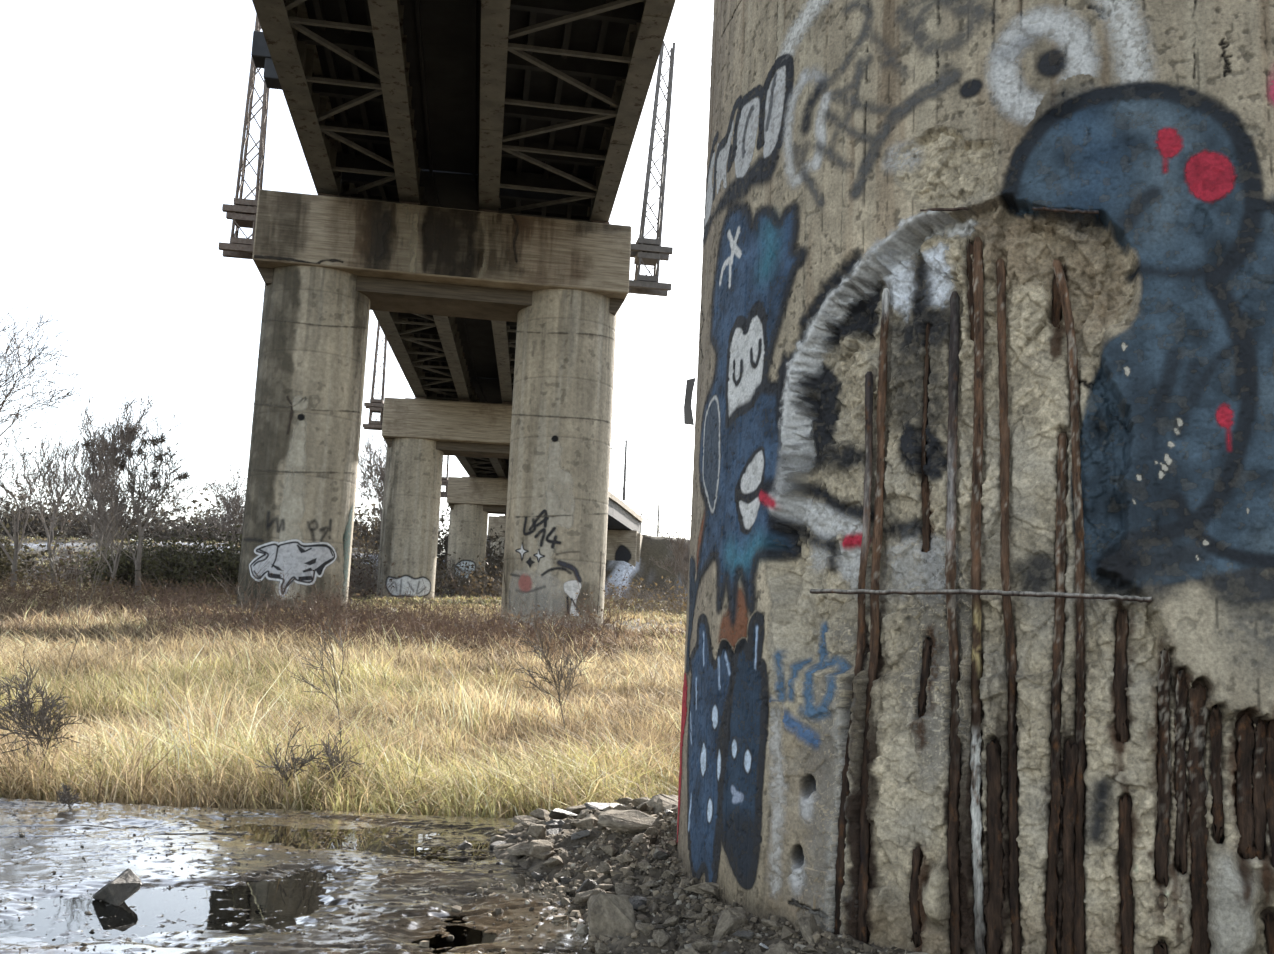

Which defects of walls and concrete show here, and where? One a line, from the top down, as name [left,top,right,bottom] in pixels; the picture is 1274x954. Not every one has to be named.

water stain [359,201,523,278]
spalling [759,123,1274,954]